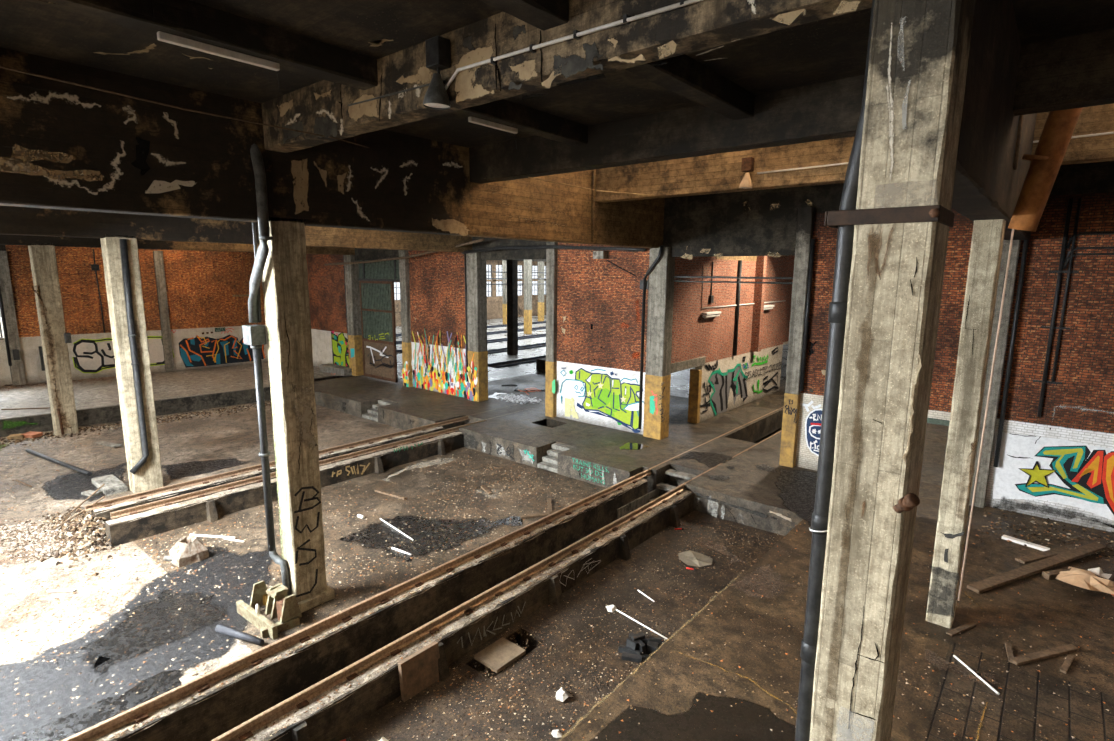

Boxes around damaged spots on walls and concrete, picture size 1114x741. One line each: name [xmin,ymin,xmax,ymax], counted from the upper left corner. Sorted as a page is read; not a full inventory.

peeling [396,65,433,84]
peeling [454,35,495,103]
spalling [509,37,645,91]
peeling [661,40,677,58]
spalling [277,94,379,144]
peeling [0,145,103,182]
peeling [145,180,195,193]
peeling [291,158,347,215]
leakage [0,546,272,741]
crack [848,605,884,731]